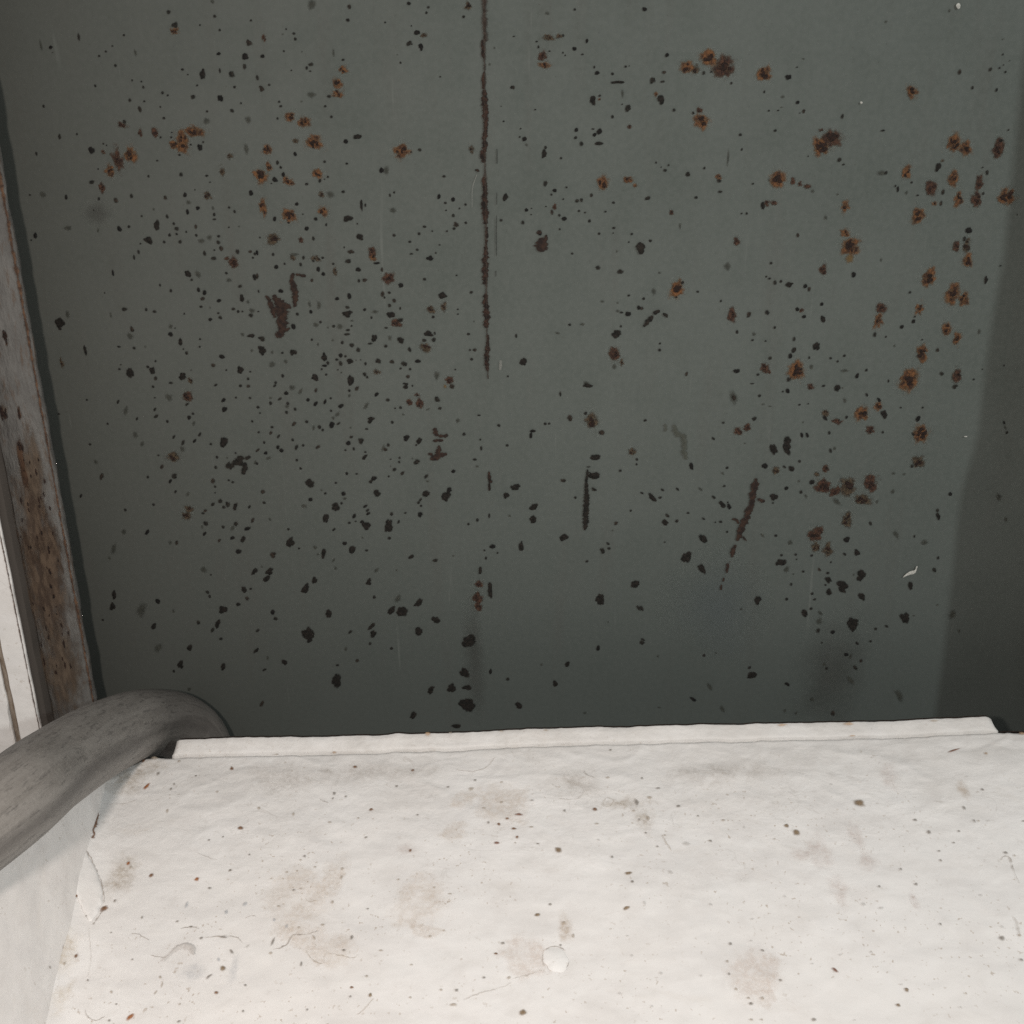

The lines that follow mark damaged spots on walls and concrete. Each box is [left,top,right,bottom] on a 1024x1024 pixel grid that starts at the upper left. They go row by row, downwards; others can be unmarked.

peeling [181,40,270,123]
rust [465,0,491,378]
rust [913,170,984,224]
rust [265,256,306,338]
peeling [117,175,455,554]
peeling [197,528,336,640]
rust [582,469,599,530]
peeling [662,467,731,574]
rust [720,478,765,590]
peeling [762,422,815,504]
peeling [761,534,915,683]
rust [814,465,876,527]